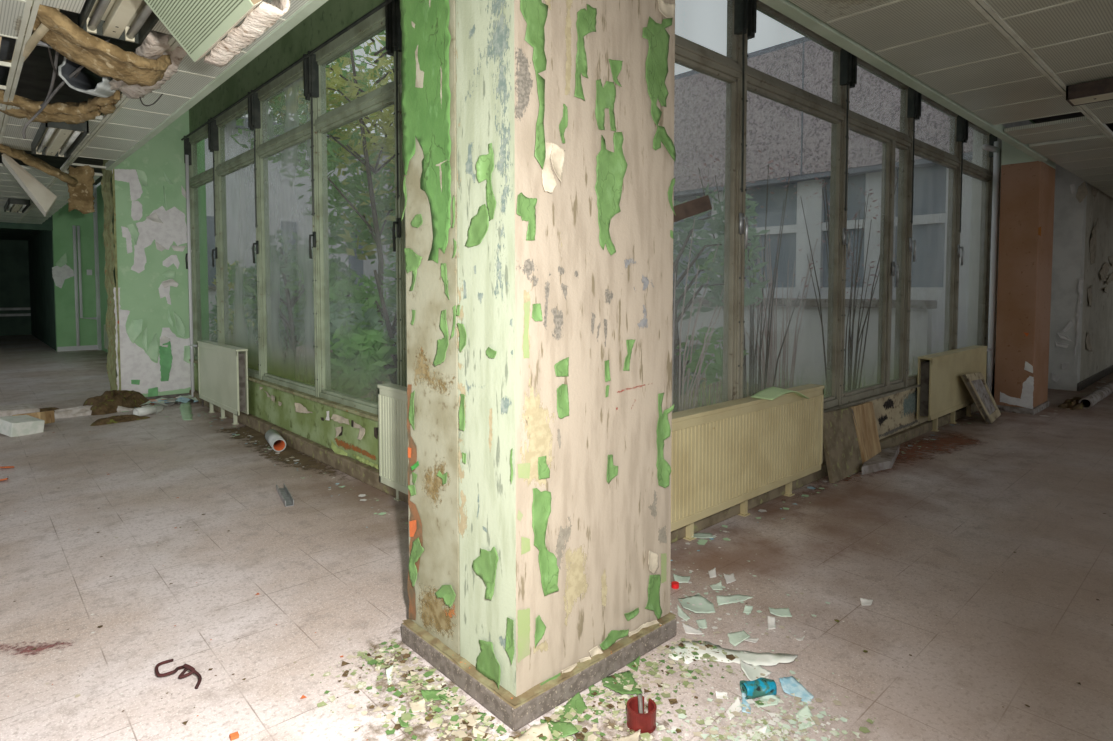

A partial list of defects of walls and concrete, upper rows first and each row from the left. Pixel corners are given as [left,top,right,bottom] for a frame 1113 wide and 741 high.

peeling [642,0,676,161]
peeling [101,160,195,397]
peeling [400,0,627,538]
spalling [0,404,55,437]
peeling [259,386,378,440]
spalling [407,384,424,621]
peeling [472,547,499,600]
peeling [476,608,548,689]
peeling [489,290,607,626]
peeling [540,393,674,685]
peeling [605,339,636,397]
peeling [1000,361,1034,409]